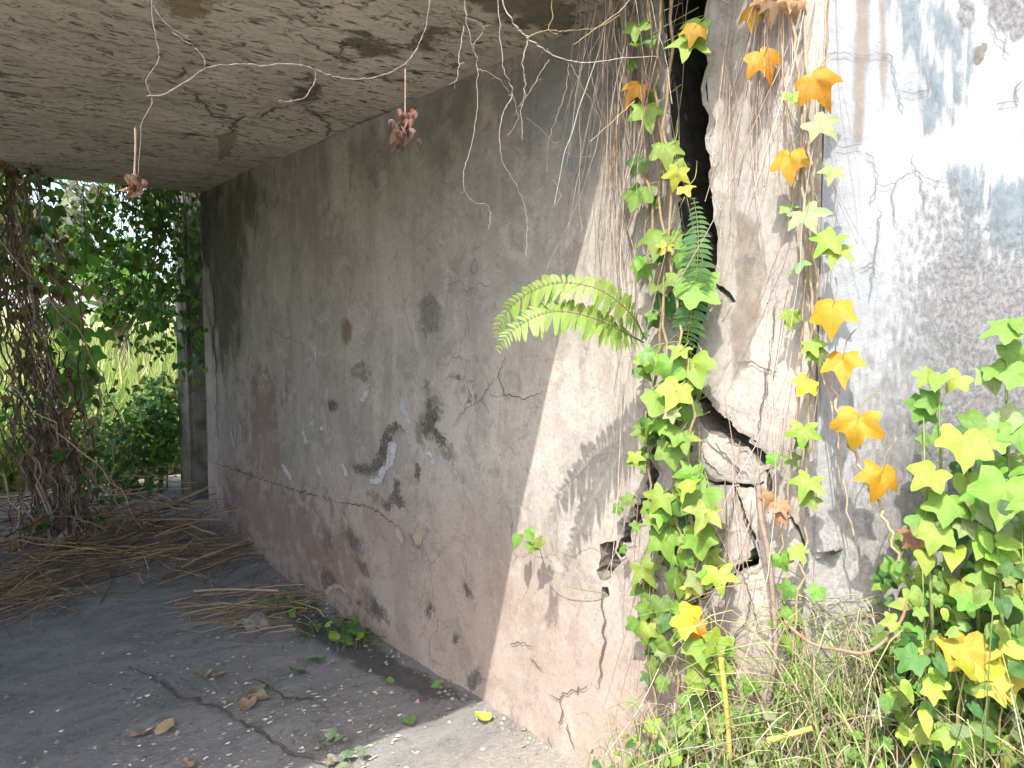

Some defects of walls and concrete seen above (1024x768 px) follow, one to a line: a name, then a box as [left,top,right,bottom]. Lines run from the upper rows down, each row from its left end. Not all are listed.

crack [827,51,932,110]
water stain [888,0,1024,134]
crack [990,24,1022,105]
crack [837,144,946,304]
crack [202,197,398,527]
crack [455,357,545,424]
crack [654,0,843,646]
crack [614,430,664,561]
spalling [596,541,627,598]
crack [129,665,334,768]
crack [548,592,606,748]